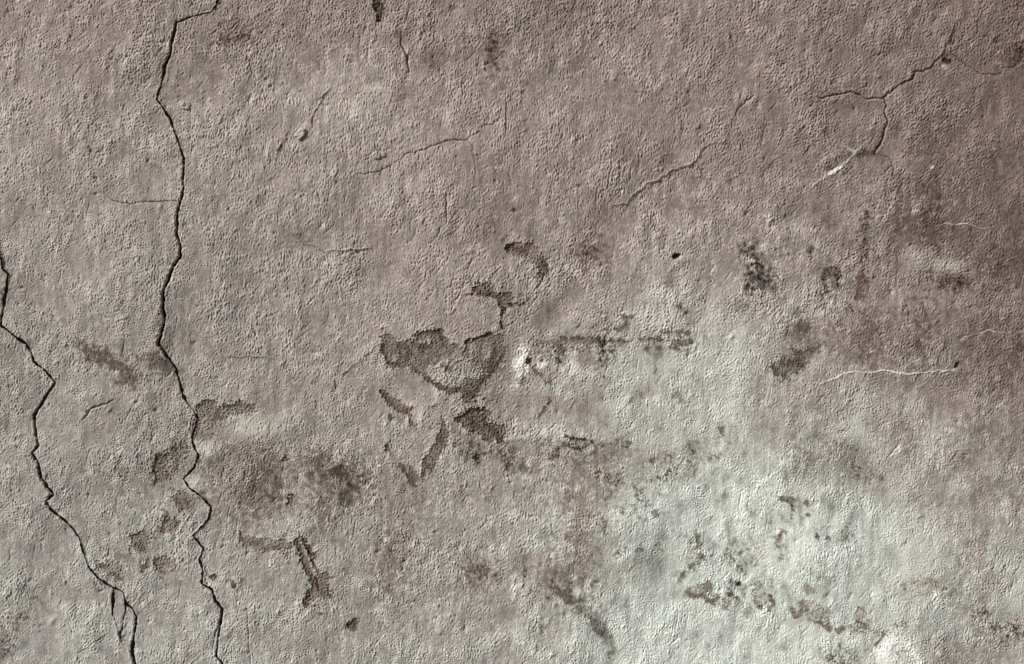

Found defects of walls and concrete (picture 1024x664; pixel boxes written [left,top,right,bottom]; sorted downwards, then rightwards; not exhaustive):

crack [821,11,1024,180]
crack [0,256,153,664]
crack [107,0,253,664]